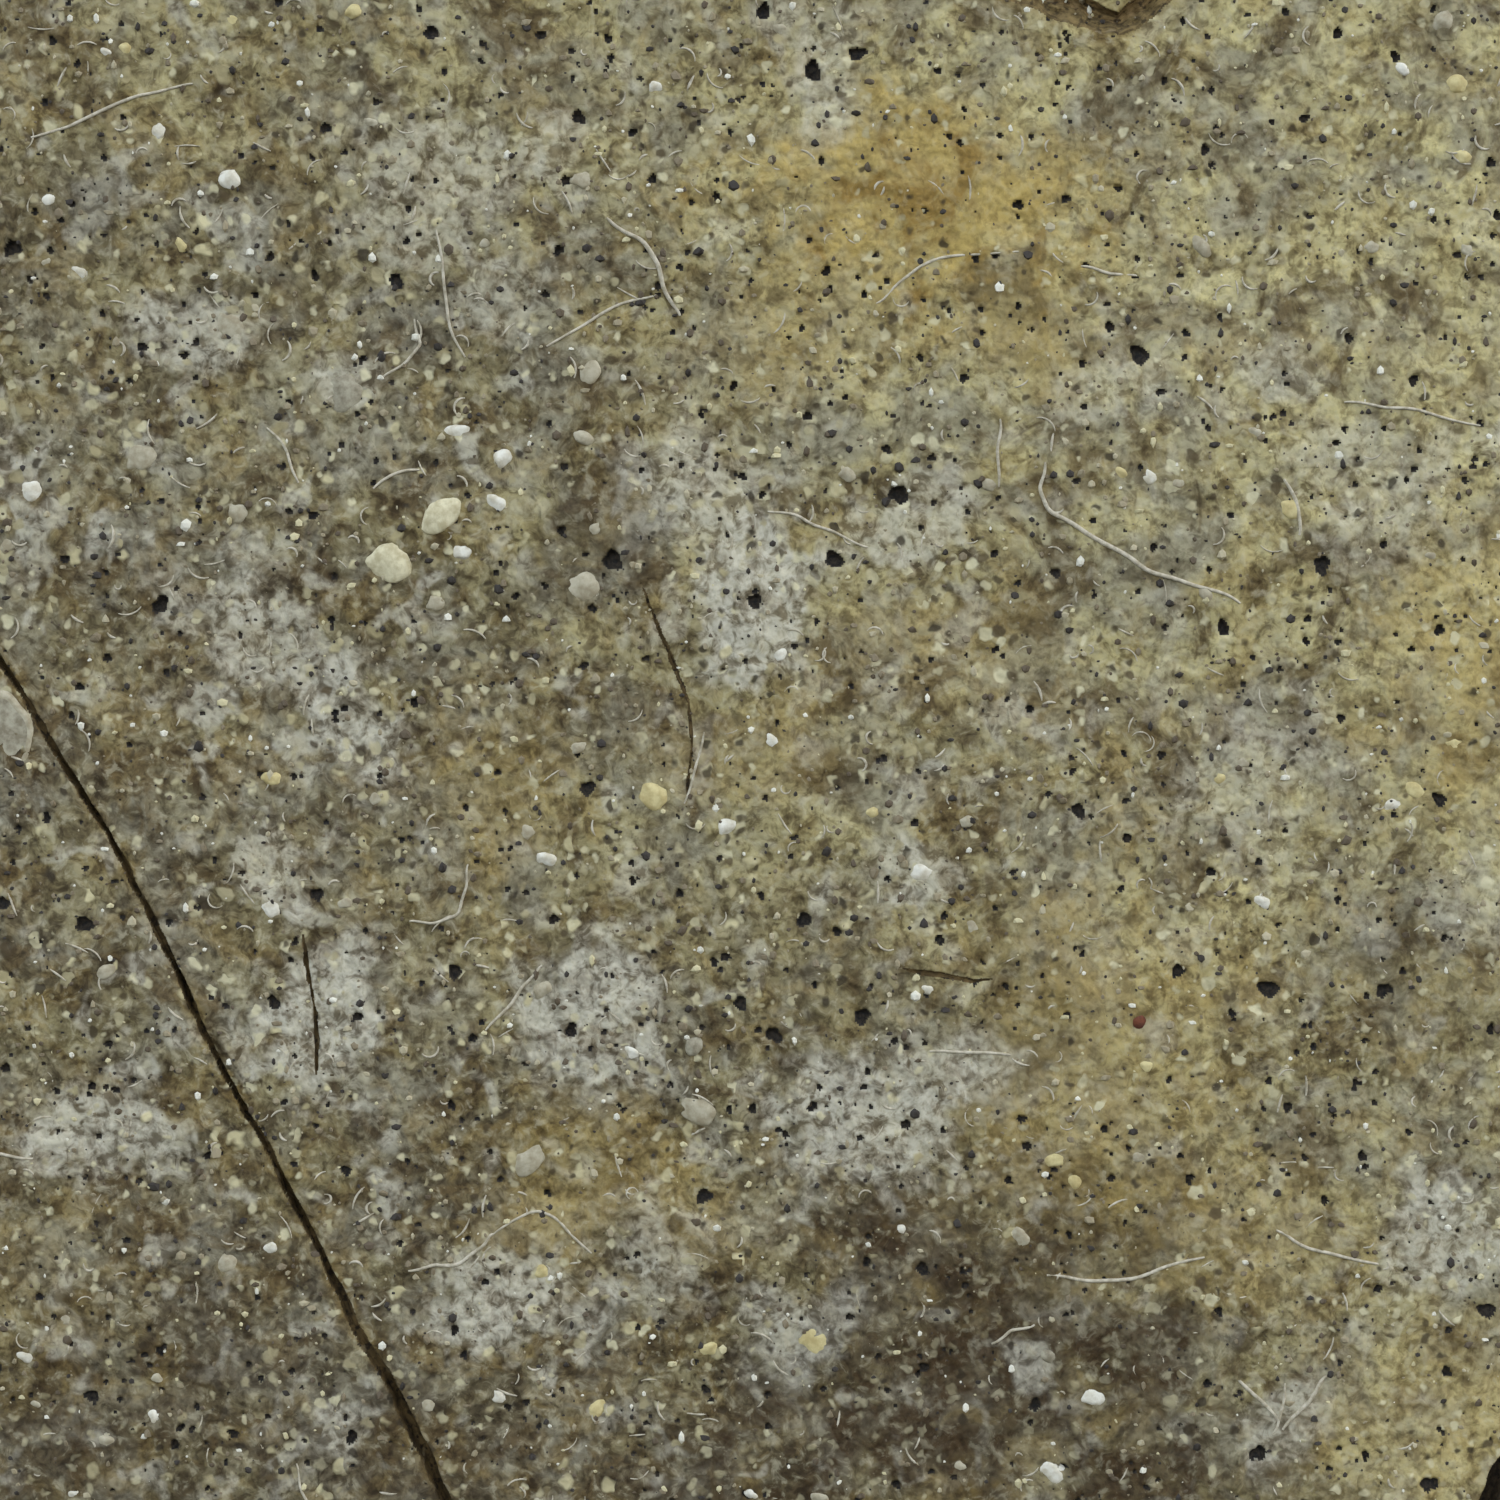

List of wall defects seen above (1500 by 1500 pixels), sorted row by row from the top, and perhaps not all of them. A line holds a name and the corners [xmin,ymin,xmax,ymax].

crack [954,0,1197,56]
crack [0,636,452,1500]
crack [1471,1456,1500,1500]